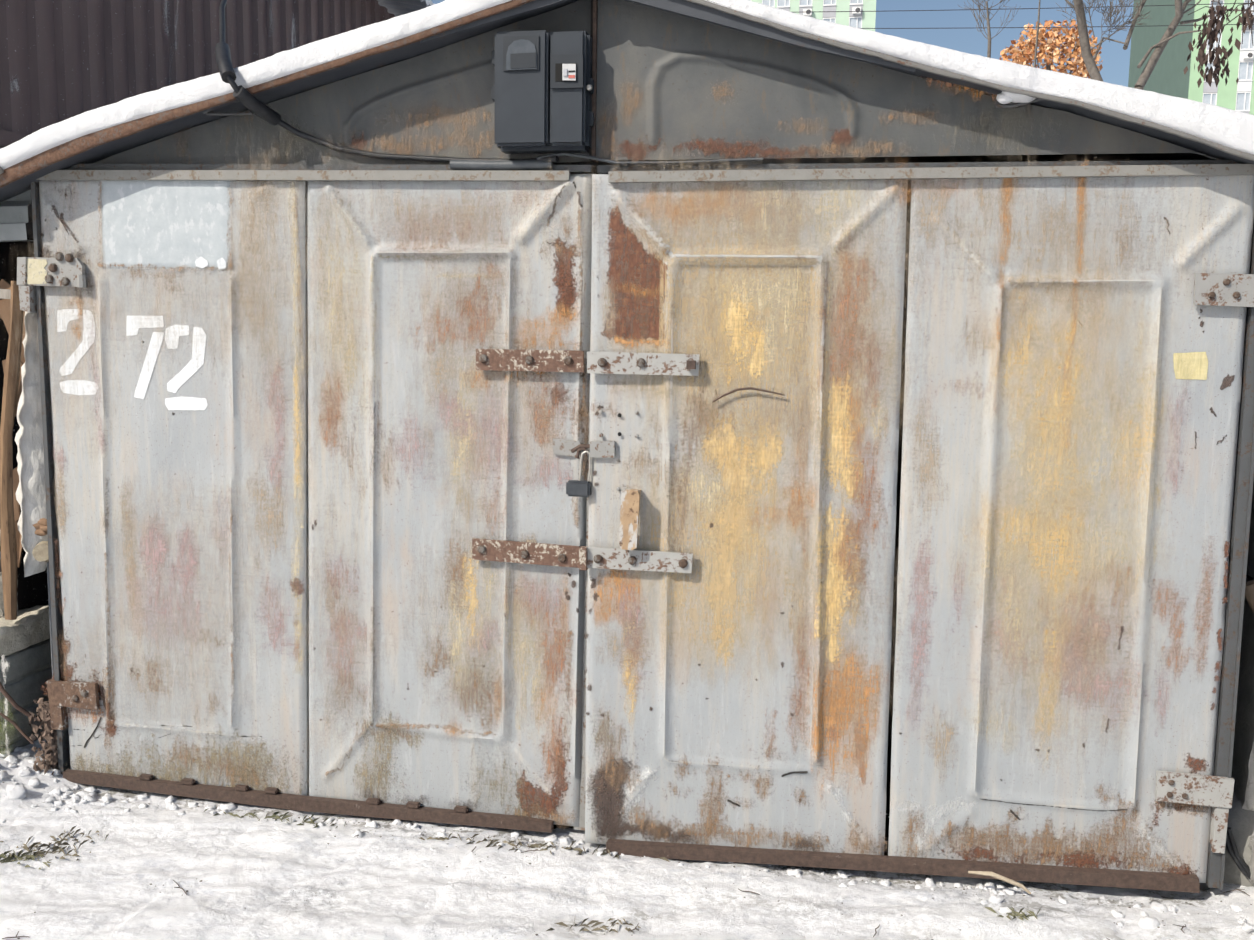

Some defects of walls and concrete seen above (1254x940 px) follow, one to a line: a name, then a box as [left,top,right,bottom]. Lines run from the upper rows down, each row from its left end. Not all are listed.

corrosion [602,84,891,161]
corrosion [523,206,668,347]
corrosion [42,634,120,745]
corrosion [64,732,300,791]
corrosion [355,714,420,798]
corrosion [468,718,571,824]
corrosion [586,712,829,851]
corrosion [808,648,879,782]
corrosion [903,788,1197,875]
corrosion [1152,801,1207,825]
corrosion [1187,753,1208,775]